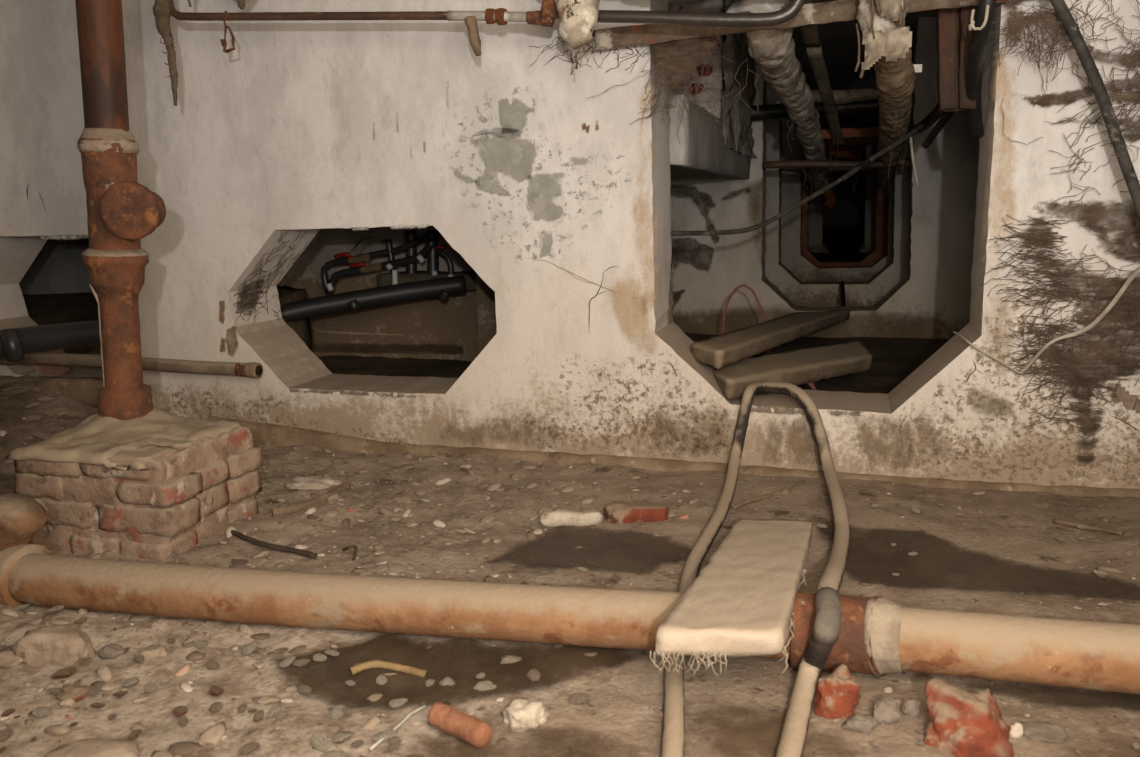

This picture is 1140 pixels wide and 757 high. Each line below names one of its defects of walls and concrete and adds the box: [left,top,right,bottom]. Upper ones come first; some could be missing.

peeling [455,88,627,259]
water stain [969,390,1013,416]
water stain [652,411,727,453]
water stain [767,419,815,463]
water stain [855,418,941,469]